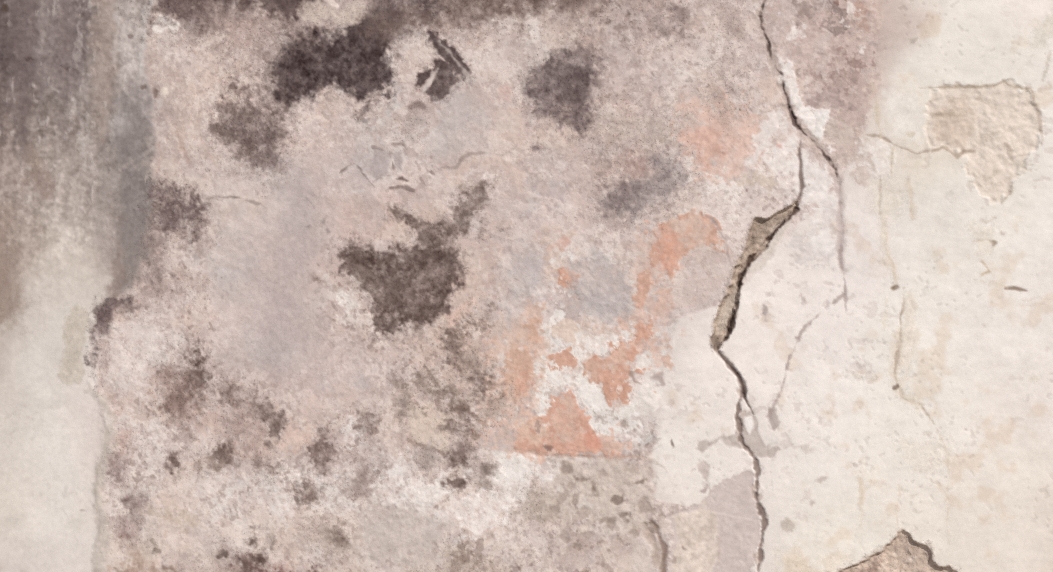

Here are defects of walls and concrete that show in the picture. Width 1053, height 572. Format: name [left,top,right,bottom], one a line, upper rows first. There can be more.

peeling [117,137,270,234]
flaking render [338,142,416,194]
crack [852,79,932,175]
damp [0,0,774,572]
peeling [375,0,1051,572]
crack [715,0,850,572]
peeling [183,413,369,522]
crack [623,518,670,572]